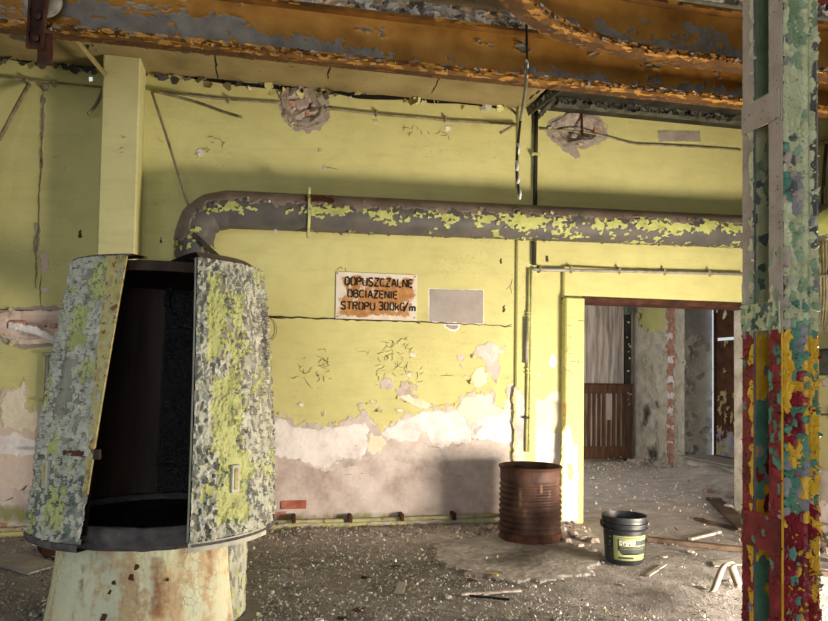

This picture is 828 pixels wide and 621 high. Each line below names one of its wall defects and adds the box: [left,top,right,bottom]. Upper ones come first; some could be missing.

spalling [165,89,227,102]
spalling [276,86,331,134]
spalling [531,92,610,160]
peeling [0,260,103,533]
crack [268,316,512,385]
peeling [265,341,580,530]
peeling [740,335,754,455]
peeling [767,2,828,621]